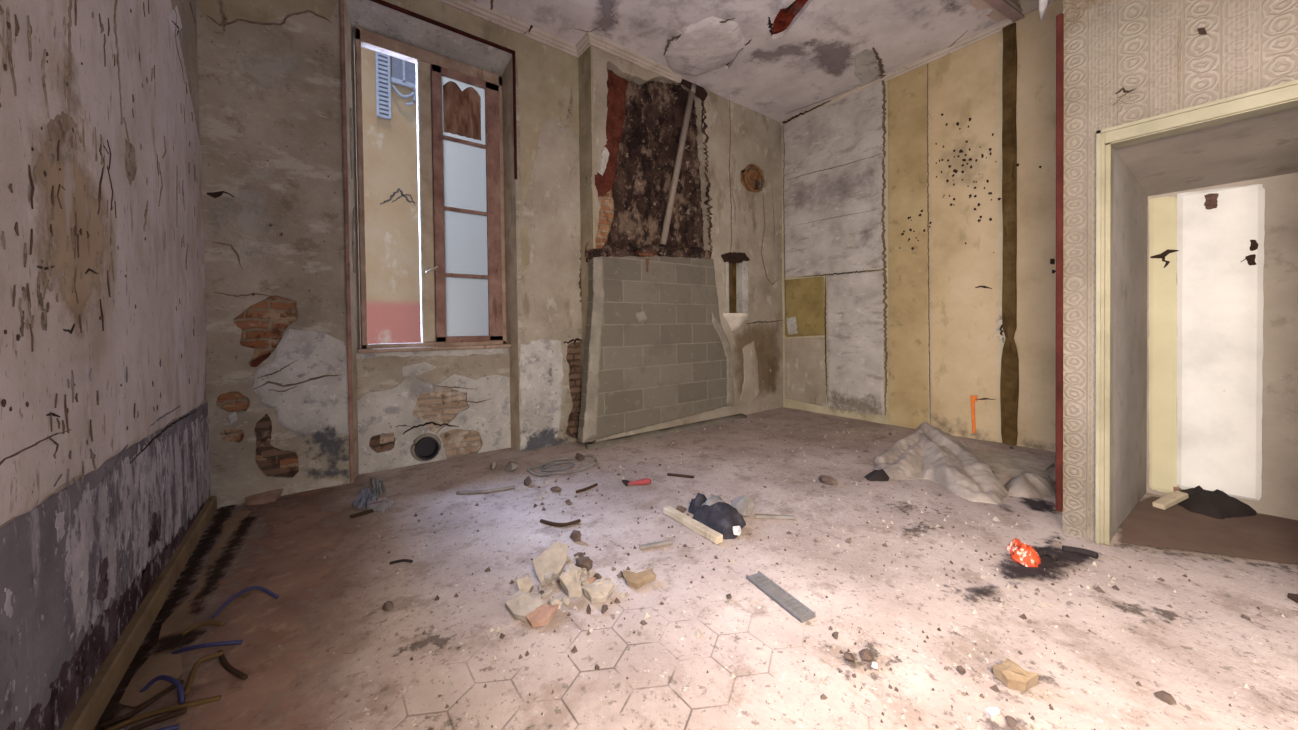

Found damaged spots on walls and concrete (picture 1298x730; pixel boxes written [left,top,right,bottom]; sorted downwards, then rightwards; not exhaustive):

crack [171,0,332,84]
spalling [701,102,715,251]
damp [36,136,105,319]
peeling [383,0,582,439]
peeling [0,0,299,647]
crack [0,413,72,487]
crack [115,406,198,468]
spalling [369,432,395,452]
spalling [412,388,482,458]